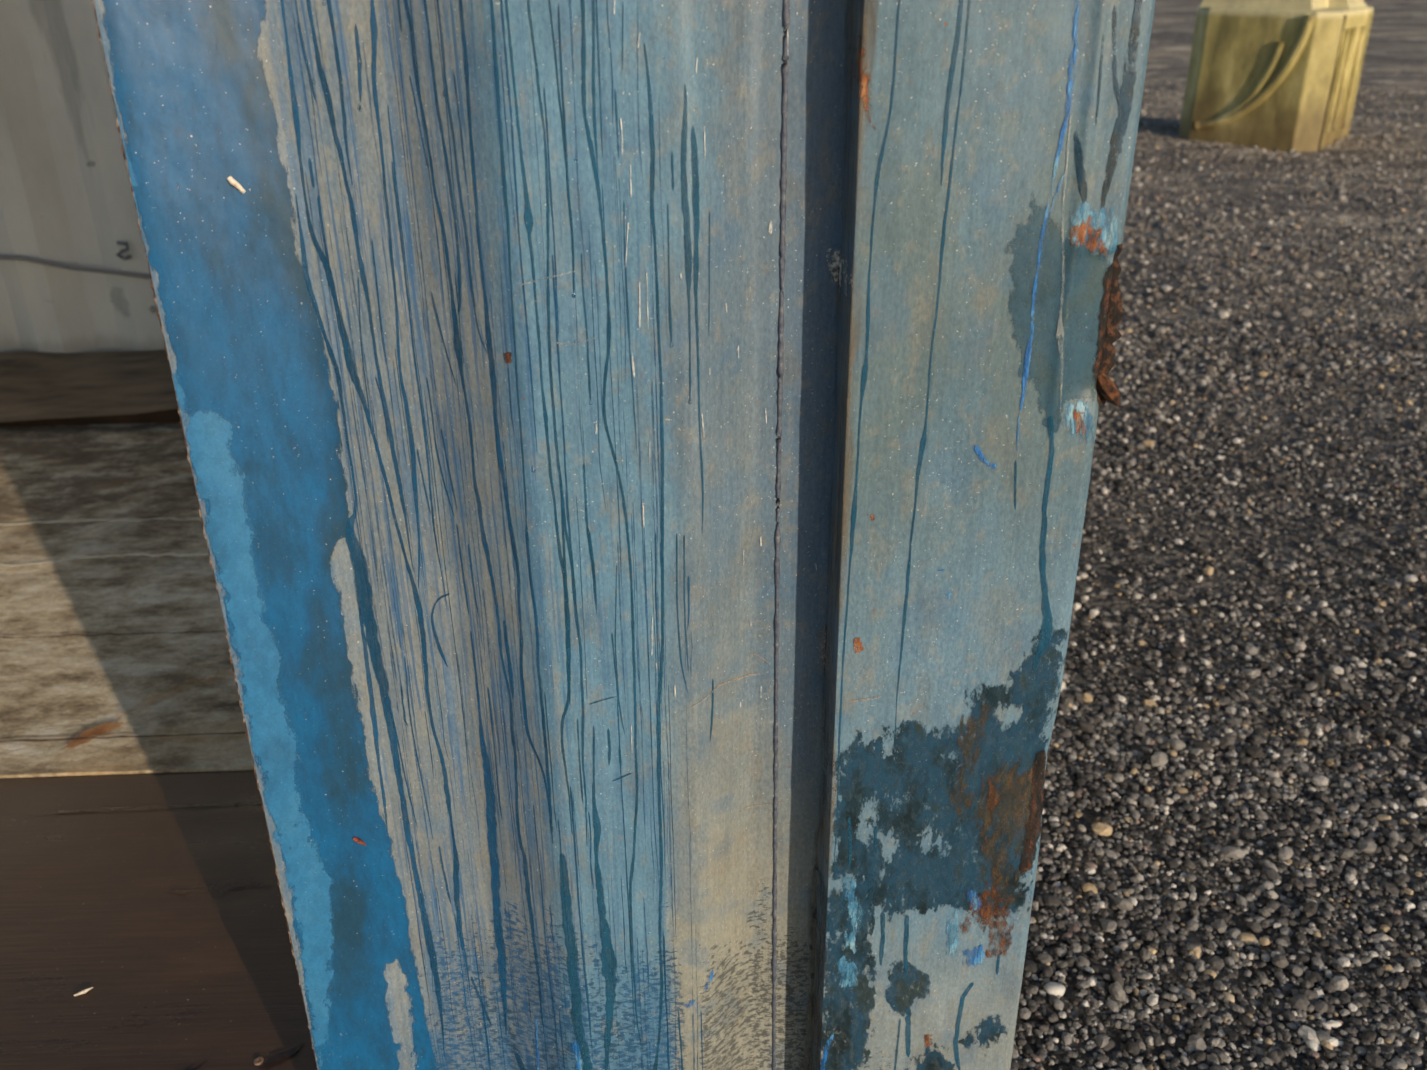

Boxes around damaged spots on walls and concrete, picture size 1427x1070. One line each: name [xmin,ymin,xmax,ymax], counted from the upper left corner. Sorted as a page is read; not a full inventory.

corrosion [847,0,876,141]
corrosion [1093,263,1120,406]
corrosion [831,291,854,609]
corrosion [951,703,1046,958]
peeling [835,878,860,988]
peeling [946,891,984,966]